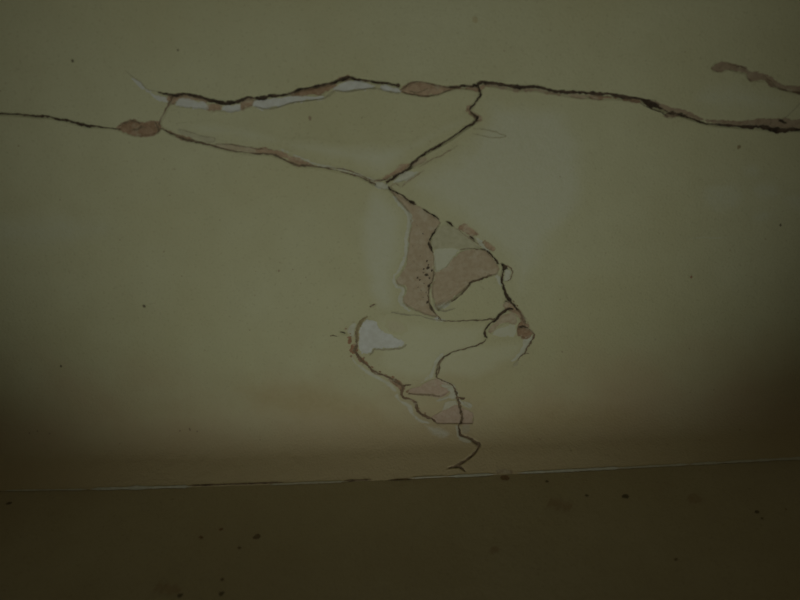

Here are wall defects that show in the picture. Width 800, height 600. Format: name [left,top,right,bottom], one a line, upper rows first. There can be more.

crack [0,61,800,190]
flaking render [388,186,499,318]
peeling [358,317,408,355]
crack [330,263,535,481]
crack [0,479,372,492]
crack [520,457,800,474]